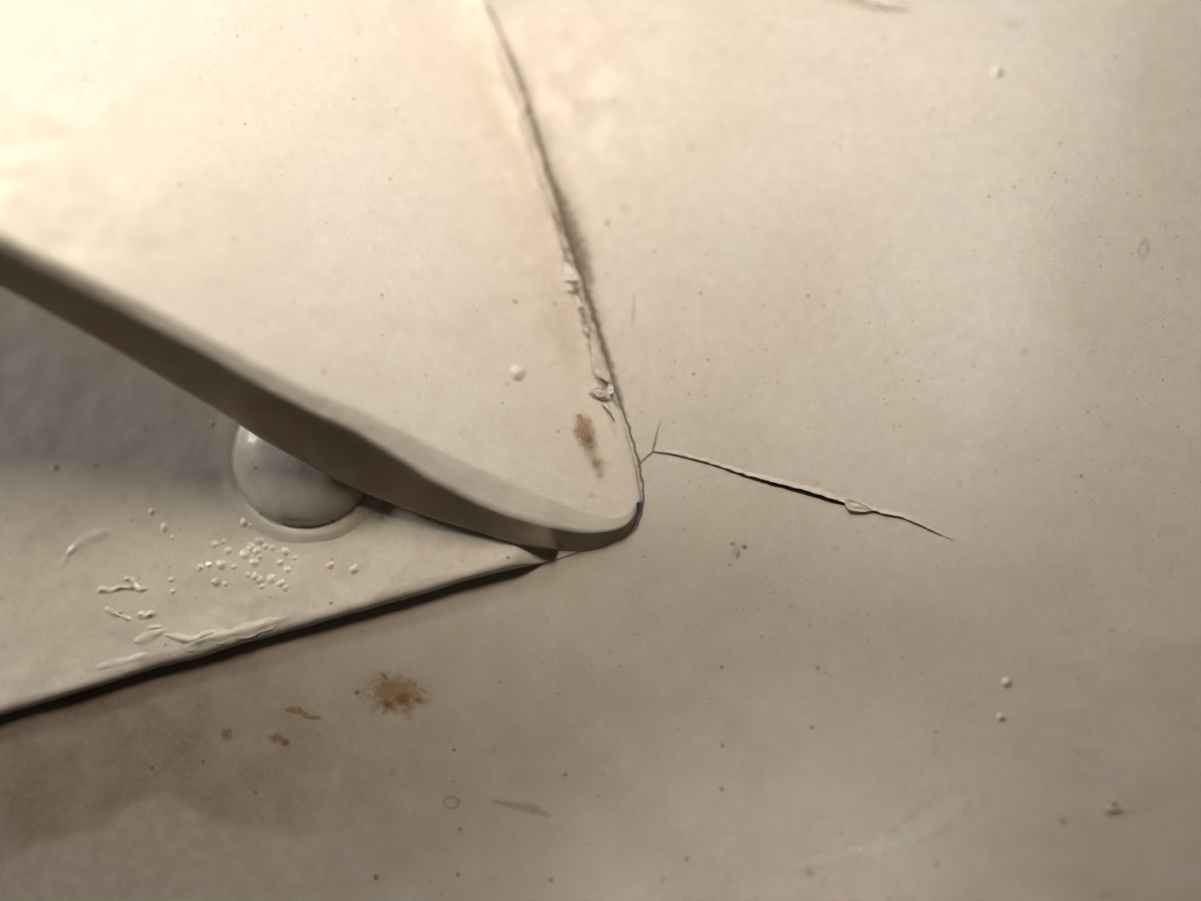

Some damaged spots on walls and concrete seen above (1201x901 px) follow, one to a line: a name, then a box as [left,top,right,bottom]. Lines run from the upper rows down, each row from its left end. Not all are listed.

crack [830,0,913,15]
peeling [491,34,616,437]
crack [637,421,954,540]